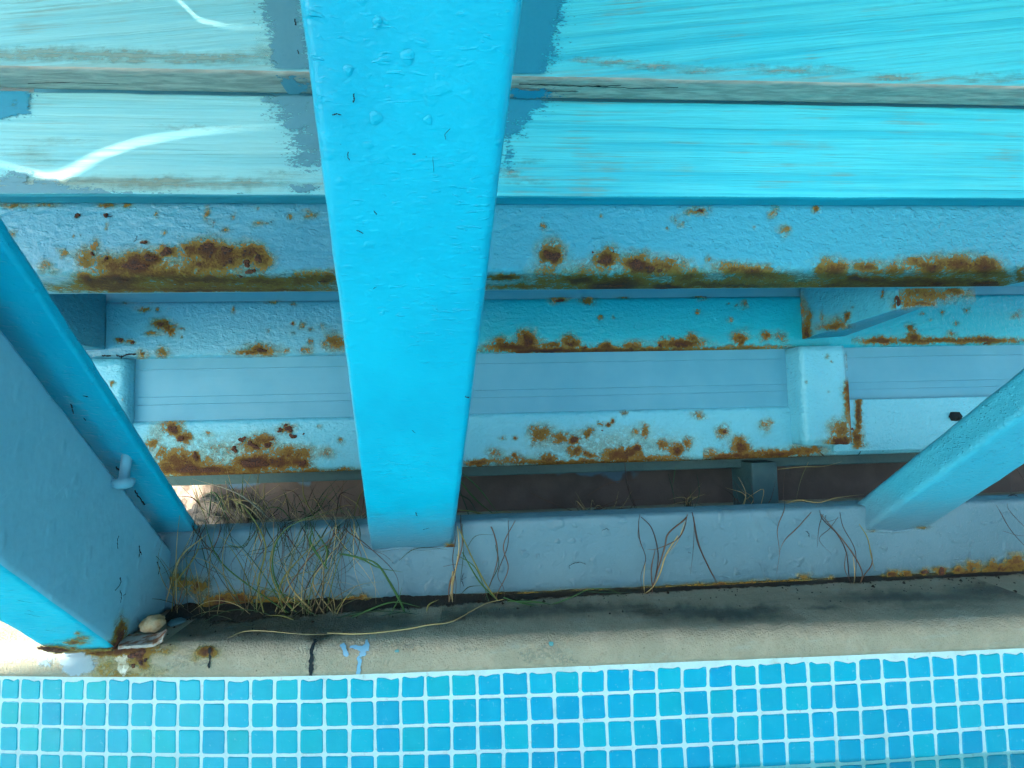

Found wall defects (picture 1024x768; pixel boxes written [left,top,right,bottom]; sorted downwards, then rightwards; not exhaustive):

rust [44,208,338,305]
rust [486,238,1024,339]
rust [115,307,183,359]
rust [233,322,345,357]
rust [477,318,788,354]
rust [856,322,1024,346]
rust [145,420,354,477]
rust [464,380,864,467]
leakage [652,605,773,621]
leakage [853,585,1015,602]
rust [37,616,172,677]
crack [308,639,318,676]